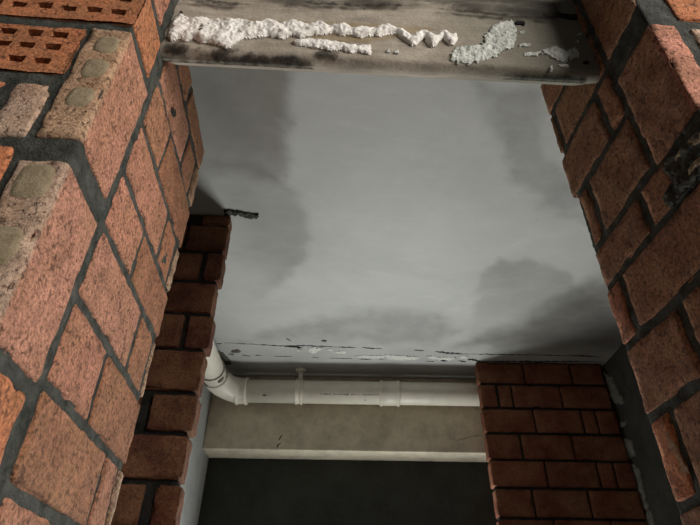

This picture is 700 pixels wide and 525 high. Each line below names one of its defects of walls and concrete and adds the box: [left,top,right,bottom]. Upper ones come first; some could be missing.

damp [162,42,314,70]
damp [316,49,338,60]
peeling [218,349,241,365]